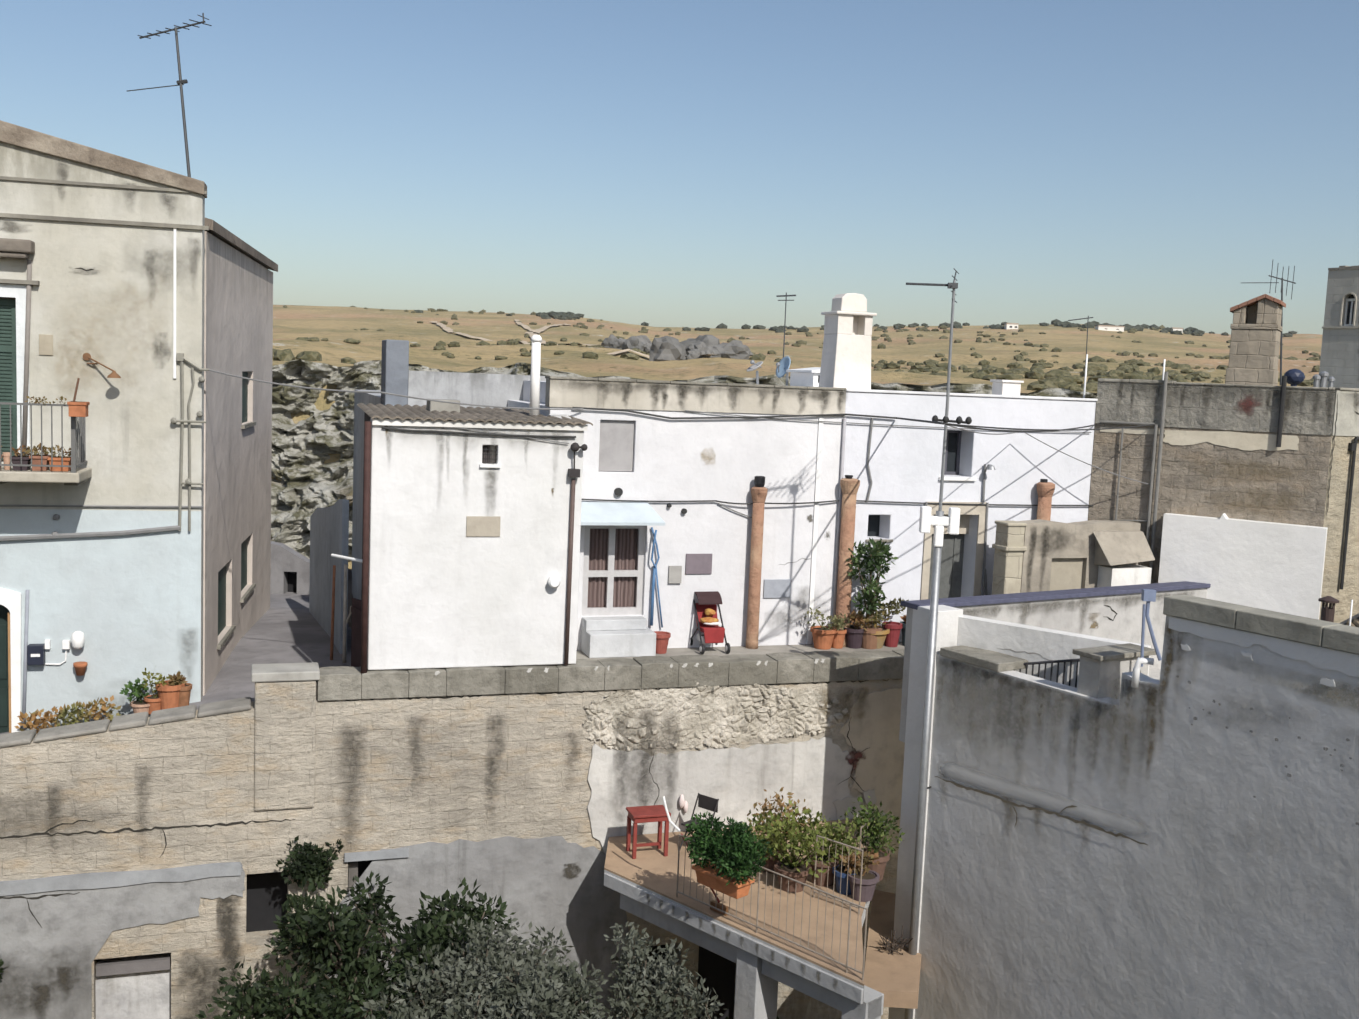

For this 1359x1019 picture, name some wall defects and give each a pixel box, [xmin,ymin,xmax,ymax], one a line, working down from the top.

damp [653,384,704,403]
flaking render [583,662,849,752]
damp [1095,625,1181,763]
crack [839,721,871,792]
crack [0,819,295,856]